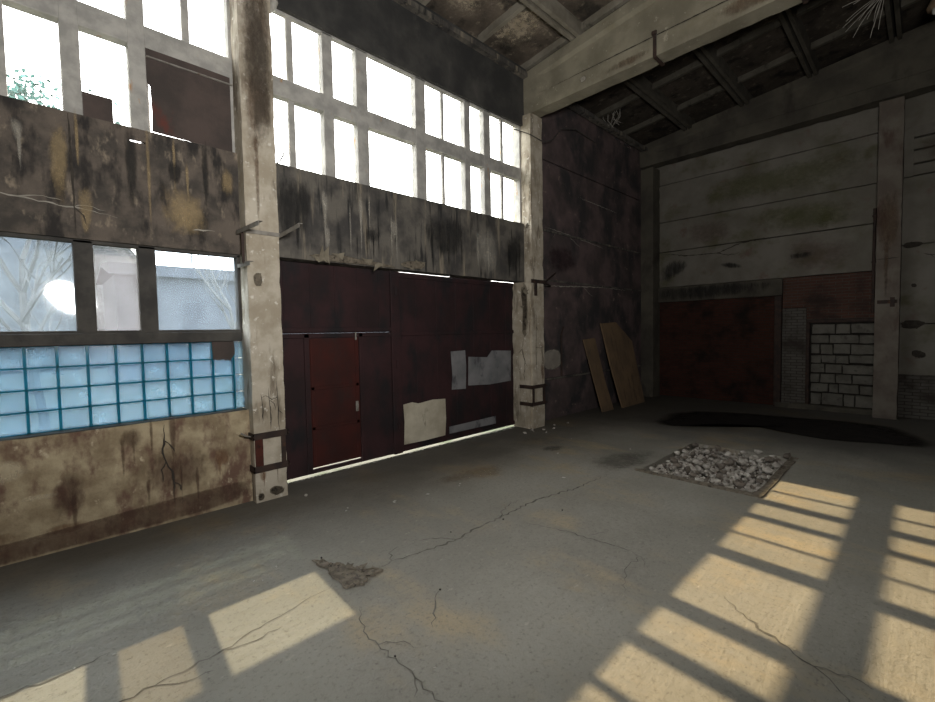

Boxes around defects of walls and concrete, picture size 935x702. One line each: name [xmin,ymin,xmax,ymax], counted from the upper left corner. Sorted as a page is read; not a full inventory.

leakage [126,137,136,197]
leakage [0,480,242,563]
crack [379,474,645,592]
crack [0,652,110,699]
crack [119,585,332,702]
crack [359,614,443,702]